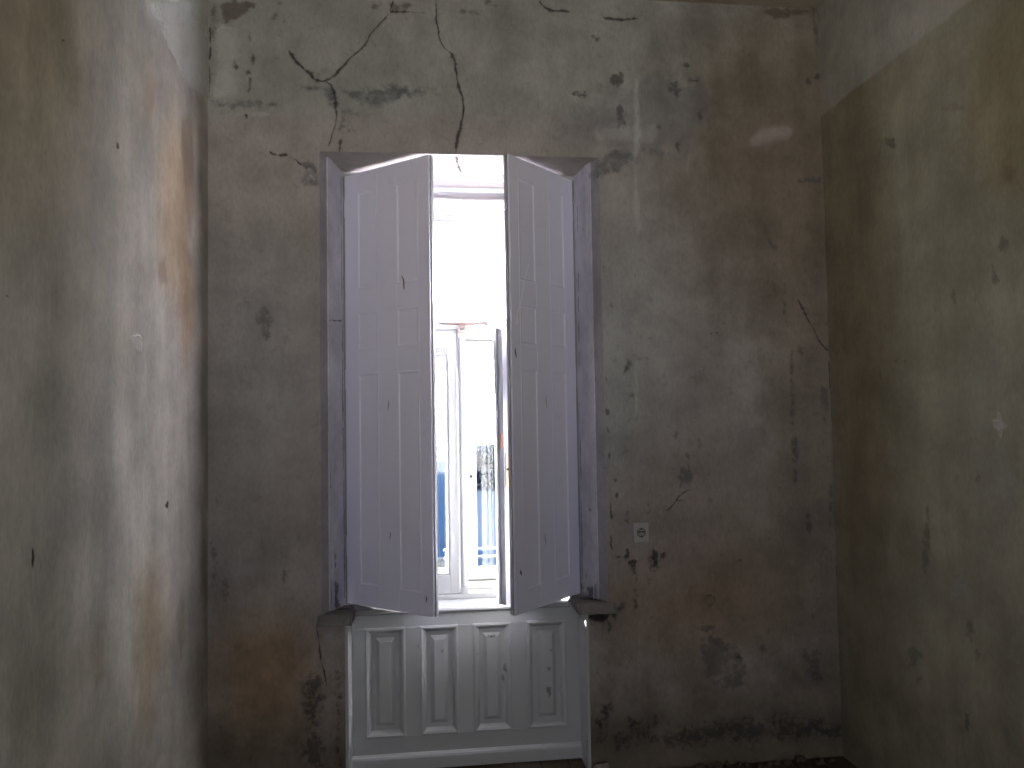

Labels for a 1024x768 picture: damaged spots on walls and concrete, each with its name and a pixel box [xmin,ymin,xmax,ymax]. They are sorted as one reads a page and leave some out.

crack [289,1,465,172]